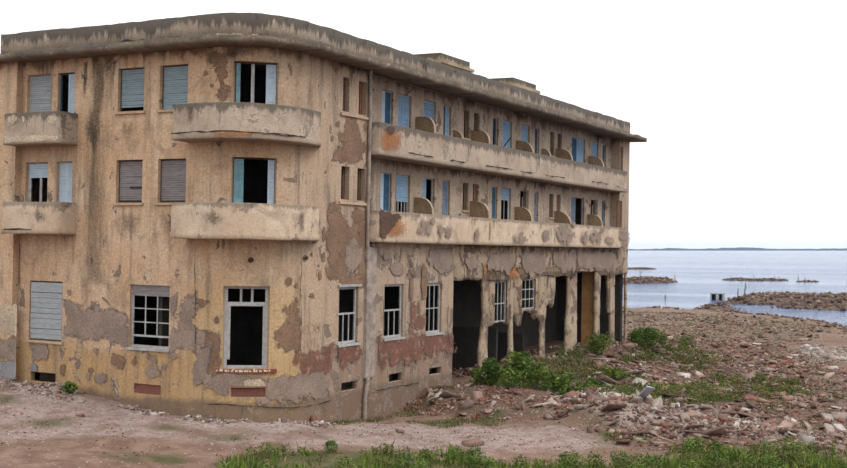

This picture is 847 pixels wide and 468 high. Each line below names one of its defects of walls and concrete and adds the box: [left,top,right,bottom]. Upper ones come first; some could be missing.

leakage [84,60,115,146]
peeling [203,49,232,101]
peeling [331,116,368,166]
peeling [303,201,371,287]
spalling [380,208,402,238]
flaking render [465,221,630,282]
flaking render [376,217,457,373]
flaking render [62,277,363,408]